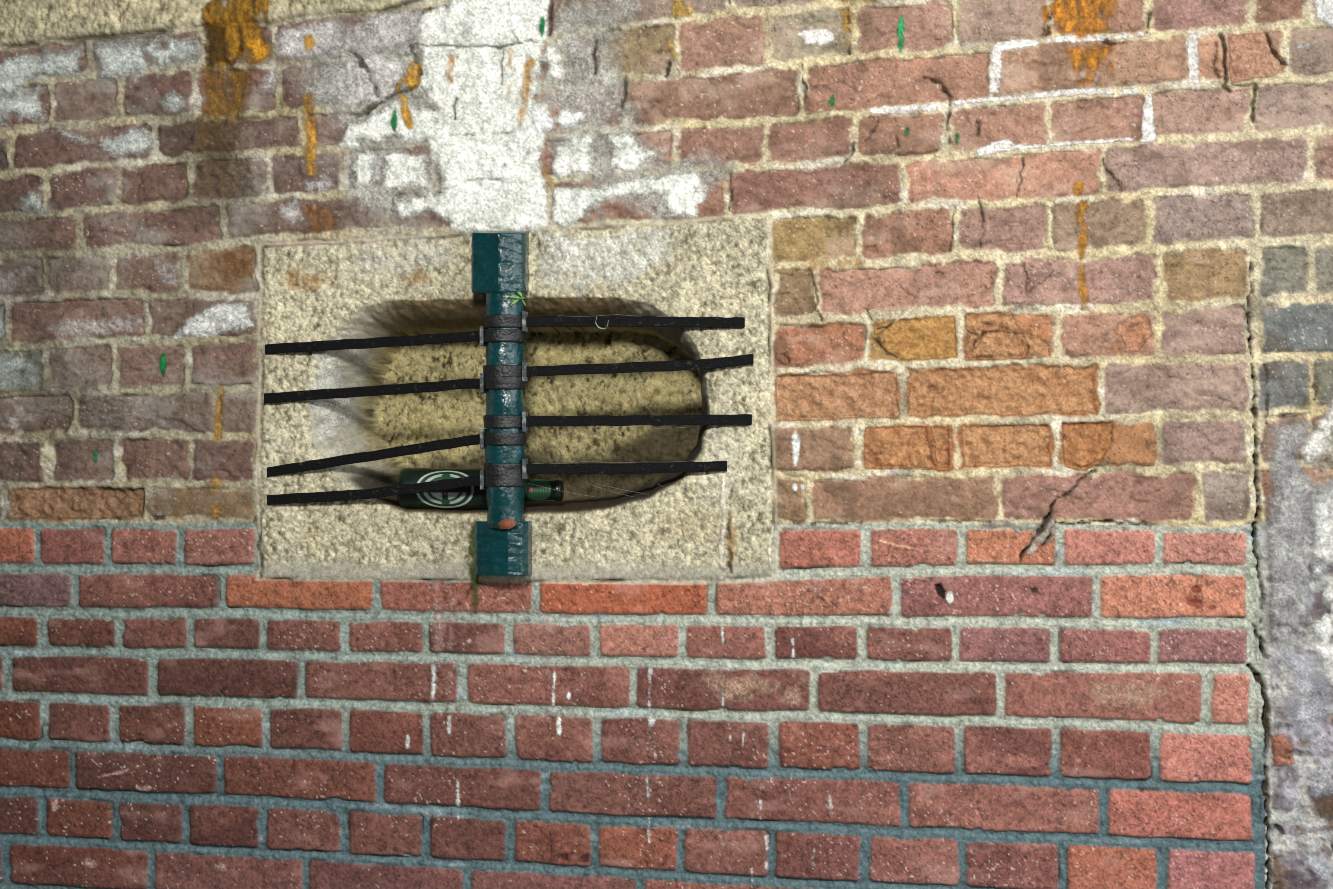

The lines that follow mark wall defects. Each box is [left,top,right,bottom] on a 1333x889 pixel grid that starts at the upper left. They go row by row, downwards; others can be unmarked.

damp [197,0,437,232]
crack [350,0,553,116]
crack [593,40,627,107]
damp [519,0,724,291]
corrosion [1043,0,1115,85]
corrosion [1074,182,1088,306]
efflorescence [311,350,352,440]
crack [1019,470,1152,562]